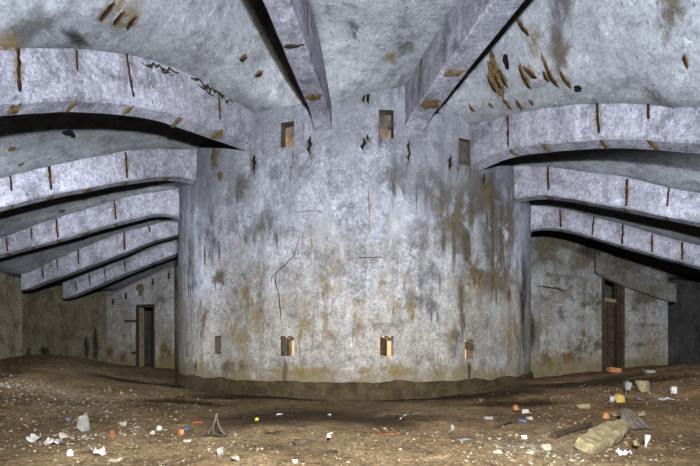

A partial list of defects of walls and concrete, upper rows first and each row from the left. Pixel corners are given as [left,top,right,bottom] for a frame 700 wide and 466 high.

corrosion [0,38,22,92]
corrosion [122,54,135,116]
spalling [486,50,534,110]
corrosion [595,103,610,149]
leakage [438,155,514,313]
crack [271,234,300,327]
leakage [521,269,535,352]